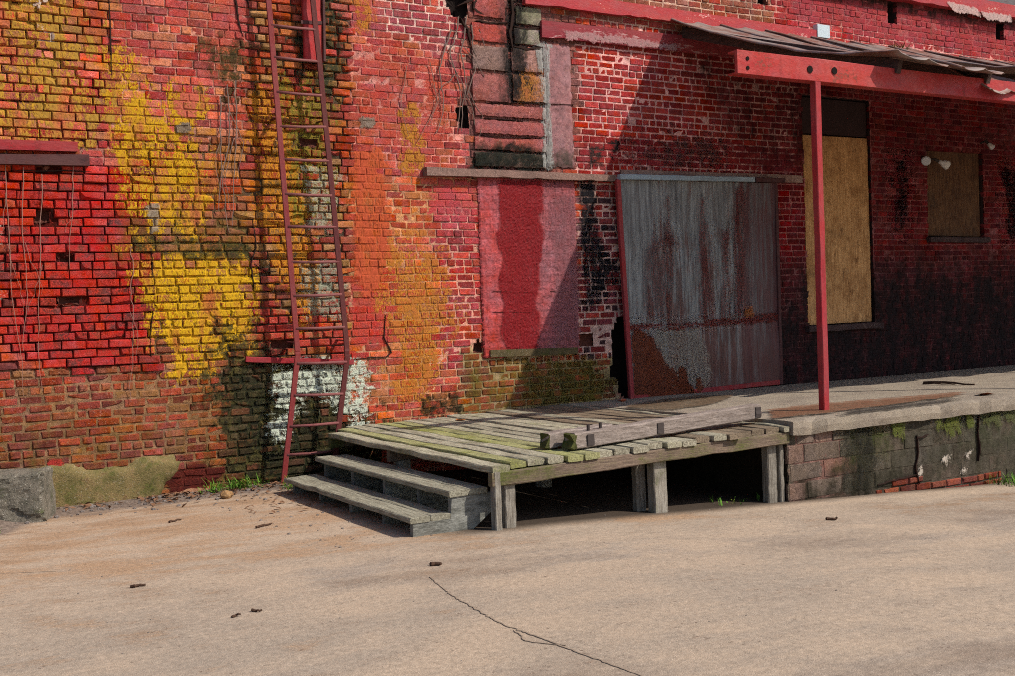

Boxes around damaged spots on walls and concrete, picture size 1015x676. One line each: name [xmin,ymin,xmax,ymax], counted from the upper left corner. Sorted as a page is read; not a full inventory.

spalling [445,0,468,23]
peeling [562,30,677,51]
peeling [947,1,1012,22]
water stain [0,0,468,483]
water stain [463,0,555,356]
water stain [576,139,620,311]
corrosion [630,187,778,397]
water stain [523,354,617,406]
water stain [891,422,906,443]
crack [429,577,643,676]